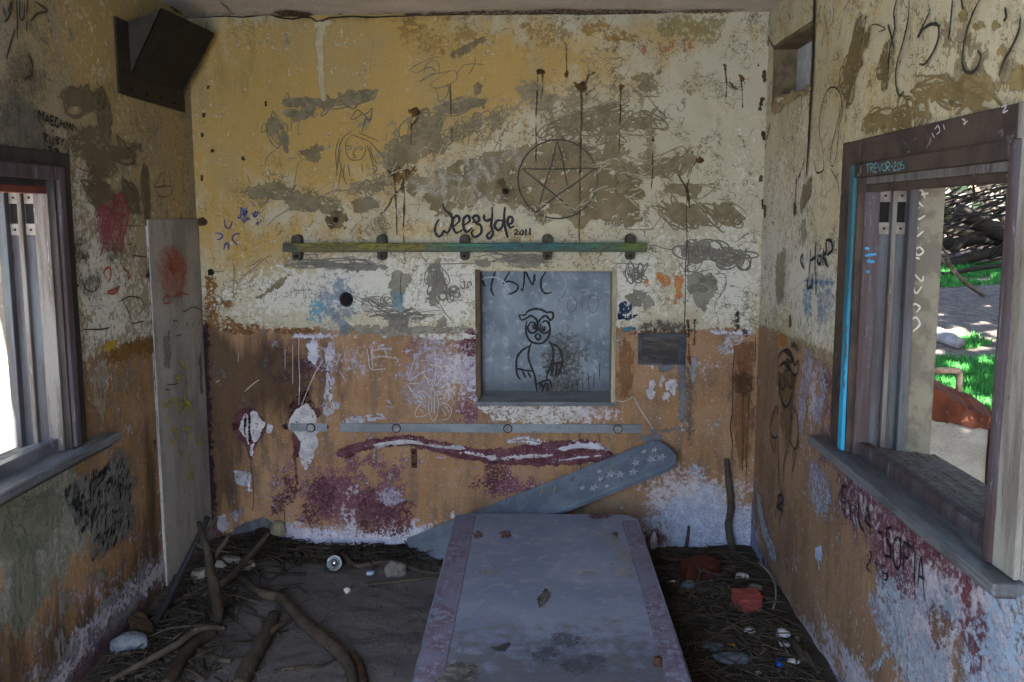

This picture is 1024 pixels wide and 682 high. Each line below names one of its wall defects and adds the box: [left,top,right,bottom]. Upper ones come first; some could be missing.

corrosion [535,69,545,160]
peeling [384,122,744,312]
corrosion [564,47,596,266]
peeling [959,9,1001,49]
peeling [959,65,1024,102]
spalling [213,258,584,538]
peeling [770,328,833,440]
spalling [44,448,166,682]
water stain [640,461,784,595]
peeling [815,546,823,570]
peeling [808,456,861,522]
peeling [868,516,1024,682]